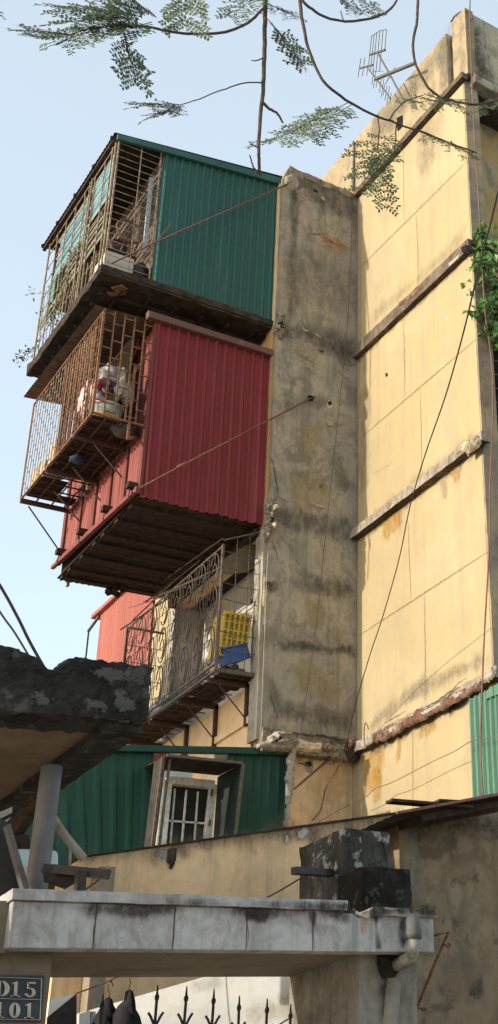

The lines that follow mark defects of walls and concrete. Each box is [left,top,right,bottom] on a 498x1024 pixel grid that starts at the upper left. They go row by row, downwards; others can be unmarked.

water stain [280,632,354,656]
peeling [83,667,136,712]
spalling [267,665,497,764]
water stain [88,898,175,917]
water stain [234,902,350,926]